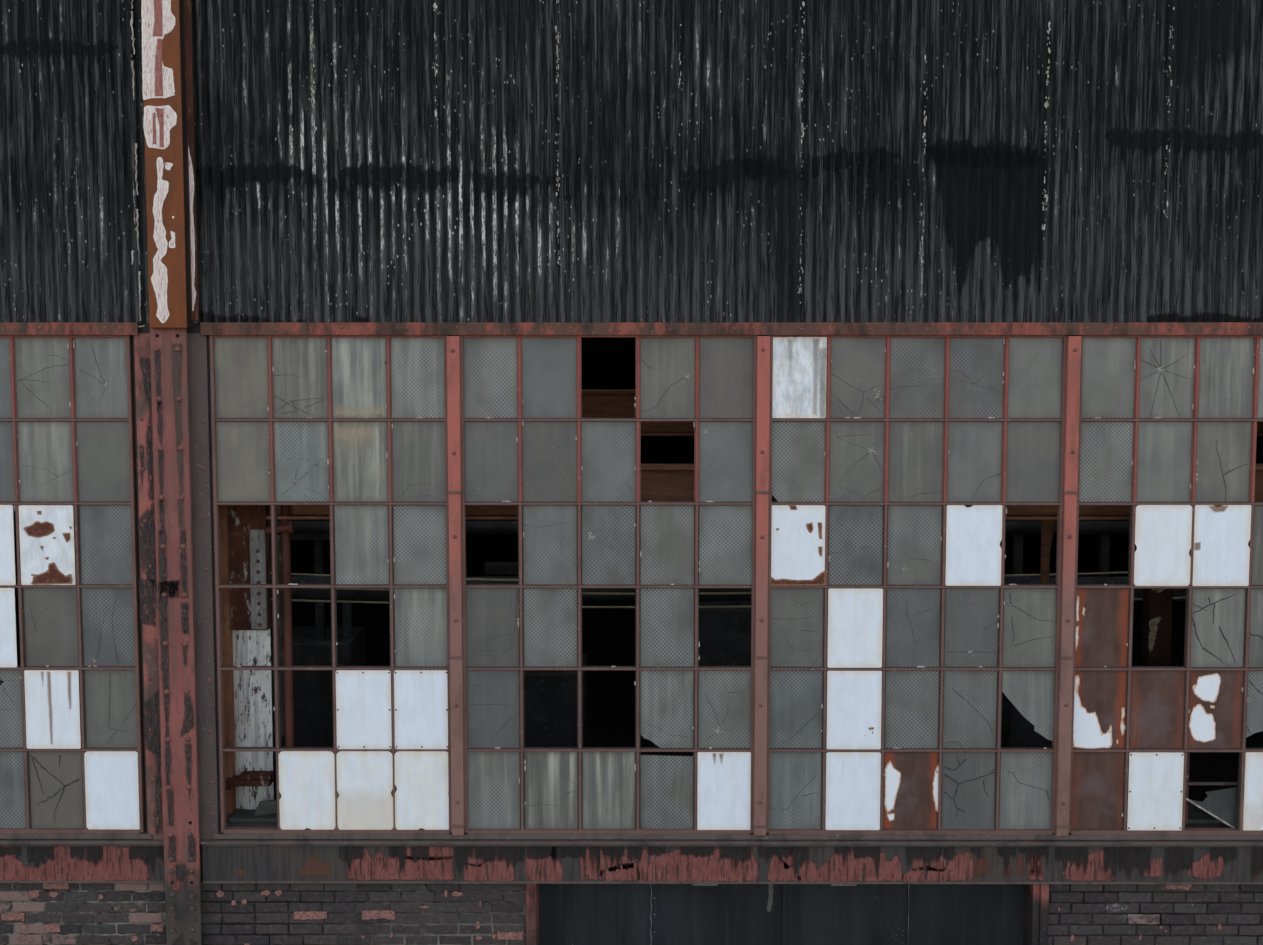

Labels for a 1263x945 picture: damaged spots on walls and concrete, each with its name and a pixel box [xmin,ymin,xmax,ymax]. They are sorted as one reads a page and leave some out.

peeling [130,0,177,327]
peeling [188,146,196,311]
damp [922,137,1049,318]
corrosion [23,511,73,585]
peeling [1063,850,1115,881]
peeling [1144,853,1224,906]